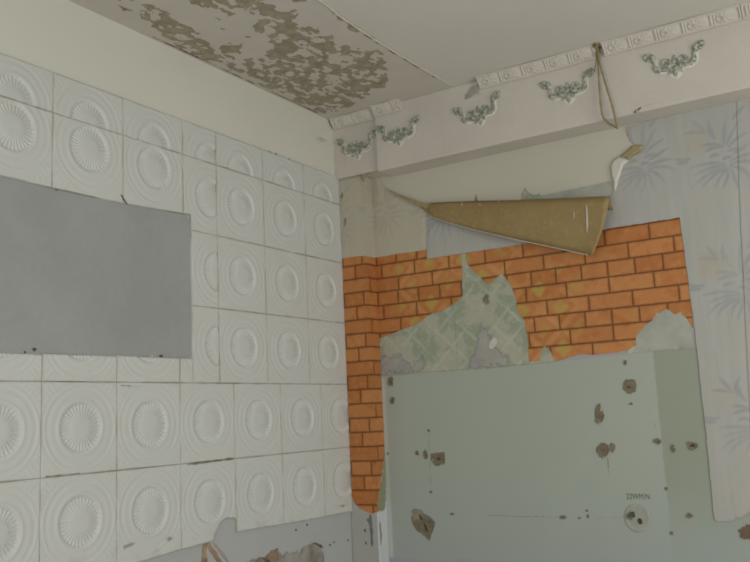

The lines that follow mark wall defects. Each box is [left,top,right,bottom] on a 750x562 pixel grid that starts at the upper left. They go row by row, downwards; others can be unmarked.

peeling [119,0,388,113]
flaking render [540,181,613,199]
spalling [623,379,637,405]
spalling [595,403,604,425]
spalling [415,450,445,466]
spalling [596,443,615,459]
spalling [411,509,435,540]
peeling [249,541,335,562]